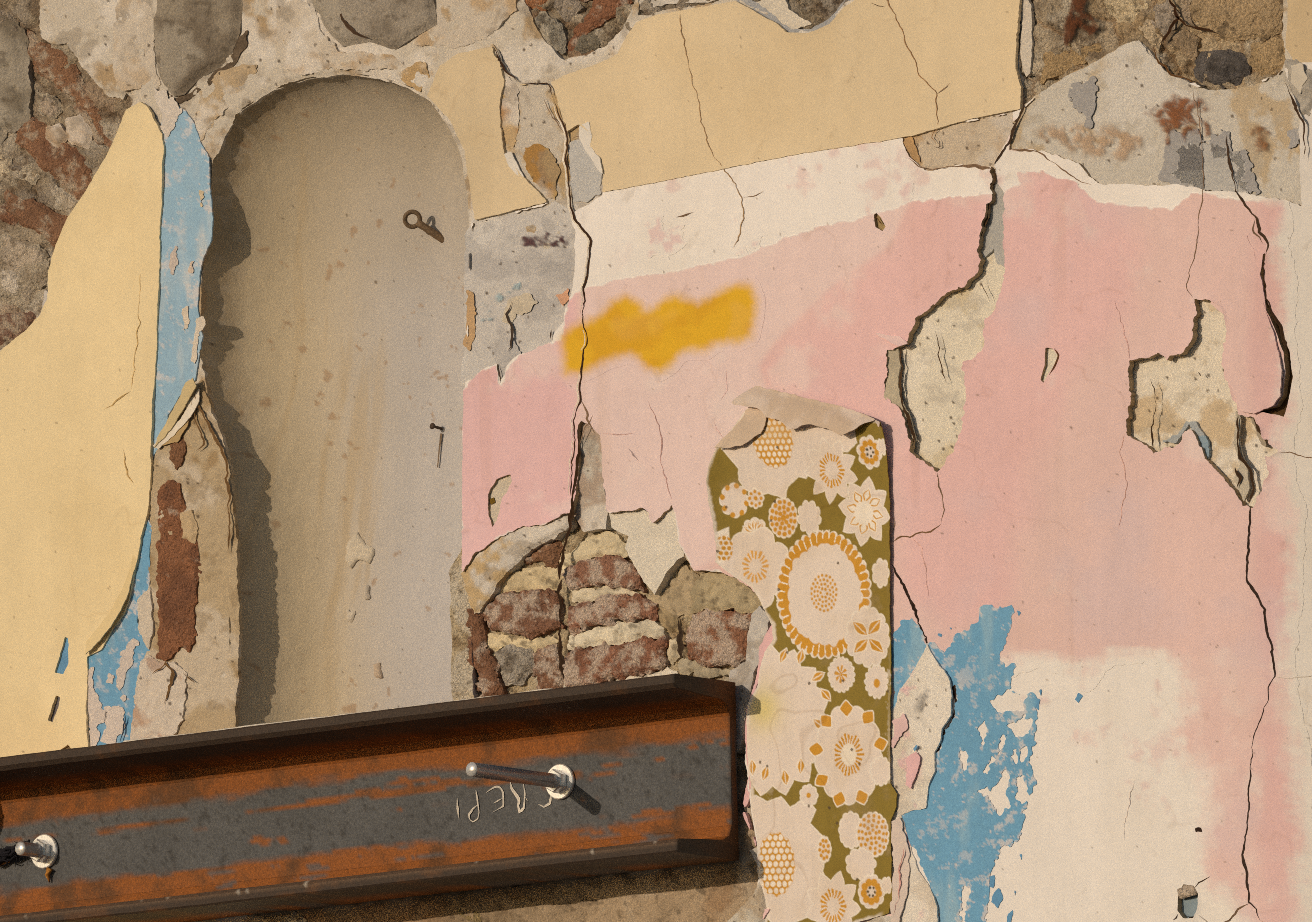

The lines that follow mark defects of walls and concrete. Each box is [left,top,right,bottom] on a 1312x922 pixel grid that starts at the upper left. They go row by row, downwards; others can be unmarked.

spalling [0,0,258,746]
crack [494,48,671,496]
crack [679,18,763,245]
flaking render [876,0,1312,519]
crack [1186,91,1293,416]
spalling [241,423,771,922]
peeling [866,605,1042,922]
crack [1224,507,1310,922]